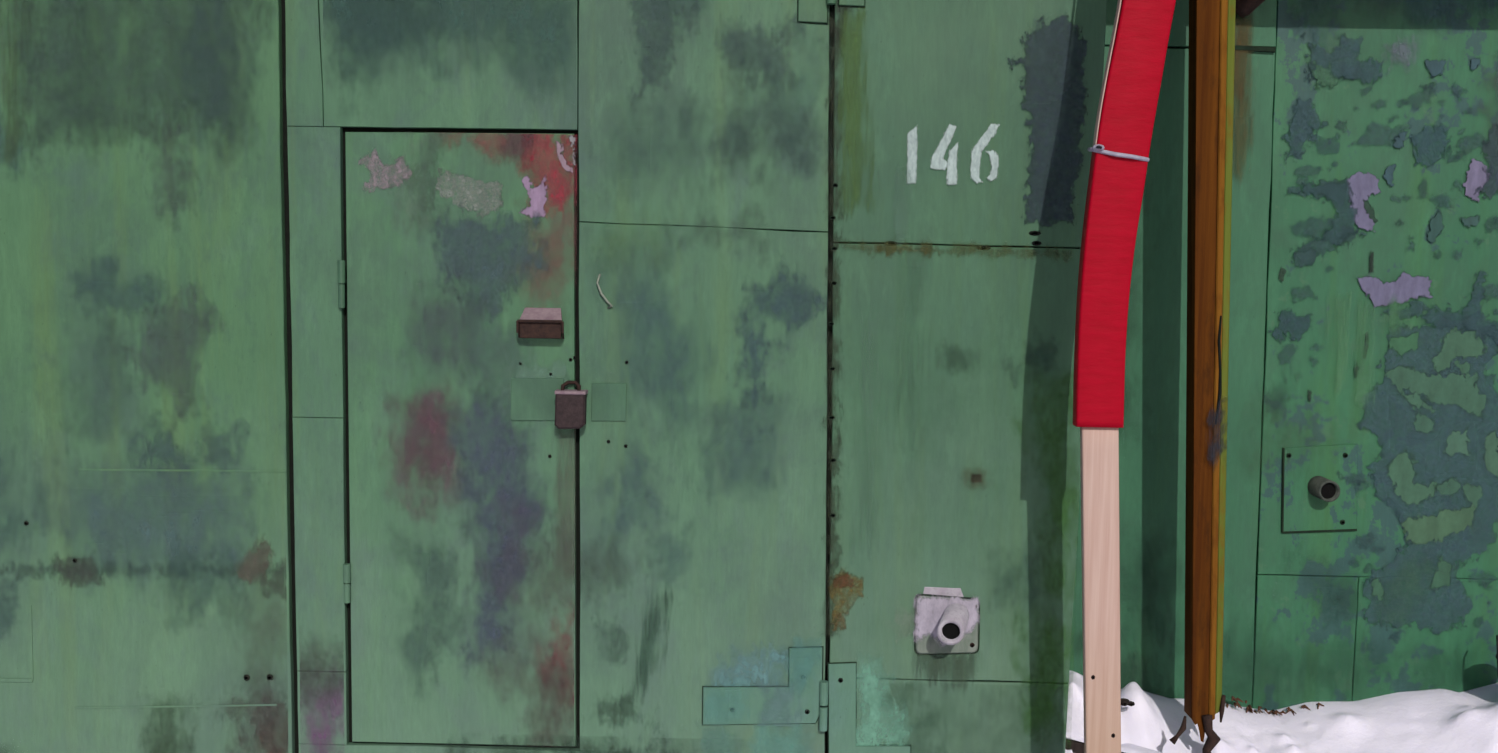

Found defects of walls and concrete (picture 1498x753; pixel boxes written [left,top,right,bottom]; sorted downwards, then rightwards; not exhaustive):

peeling [359,151,412,193]
peeling [519,173,548,219]
peeling [556,135,577,174]
peeling [1282,33,1446,159]
peeling [1288,123,1451,268]
peeling [1426,123,1498,243]
peeling [1267,309,1312,341]
corrosion [823,339,864,635]
peeling [1356,271,1498,635]